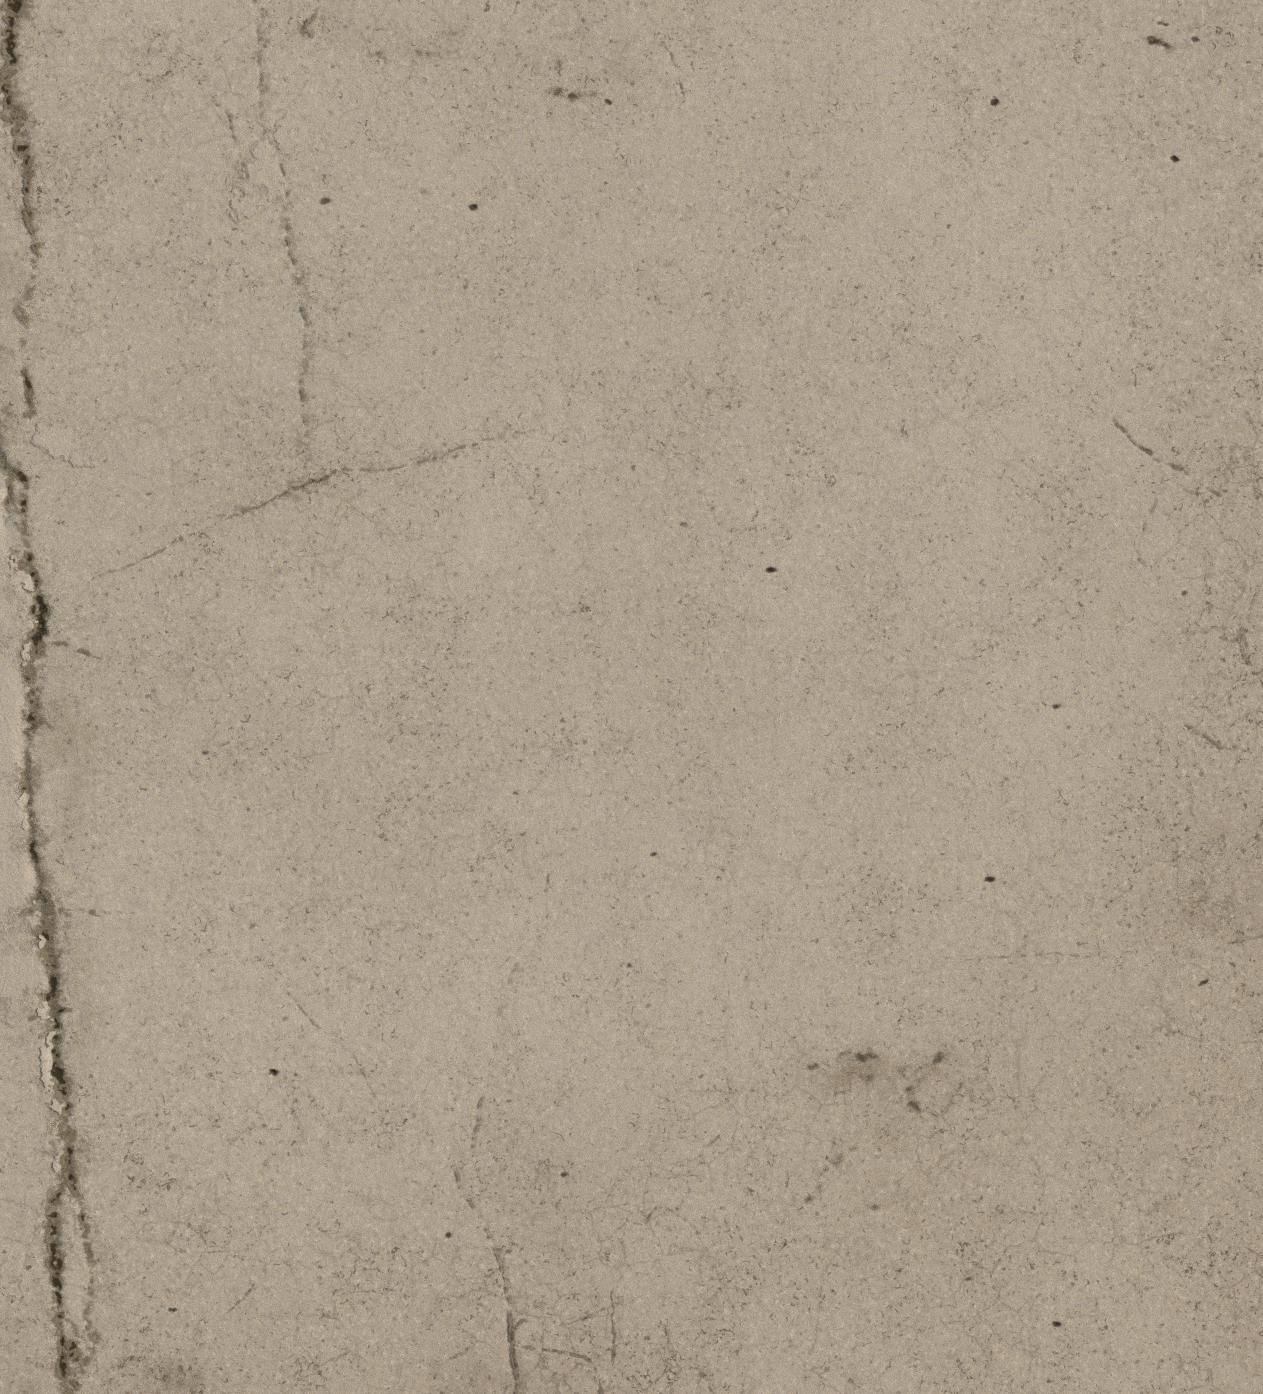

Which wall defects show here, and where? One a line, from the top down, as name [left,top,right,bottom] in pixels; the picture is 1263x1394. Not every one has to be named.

crack [254,0,265,104]
crack [305,9,319,36]
crack [271,143,308,347]
crack [230,439,485,518]
crack [0,0,102,1394]
crack [1186,724,1248,751]